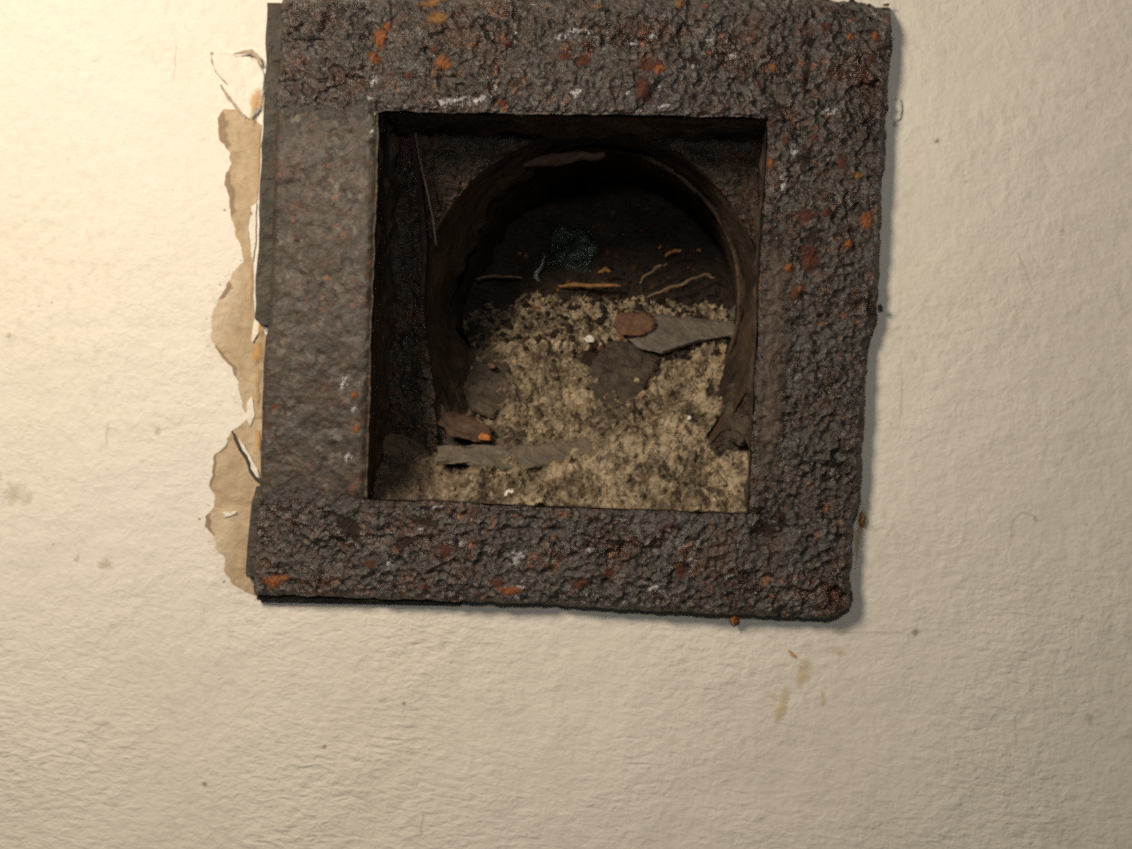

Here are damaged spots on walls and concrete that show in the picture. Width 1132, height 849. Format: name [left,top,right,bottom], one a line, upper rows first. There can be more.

peeling [197,52,266,604]